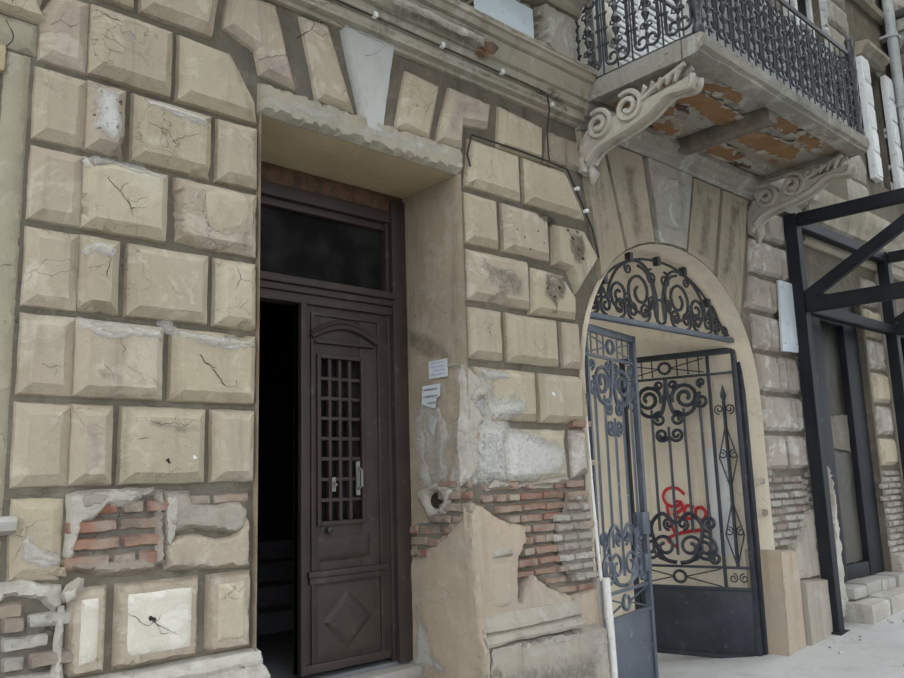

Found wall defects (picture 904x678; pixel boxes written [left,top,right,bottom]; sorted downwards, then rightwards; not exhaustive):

peeling [652,77,752,139]
peeling [702,114,823,169]
peeling [410,363,599,594]
flaking render [759,470,817,547]
flaking render [879,470,904,552]
spalling [0,487,249,678]
peeling [414,608,444,673]